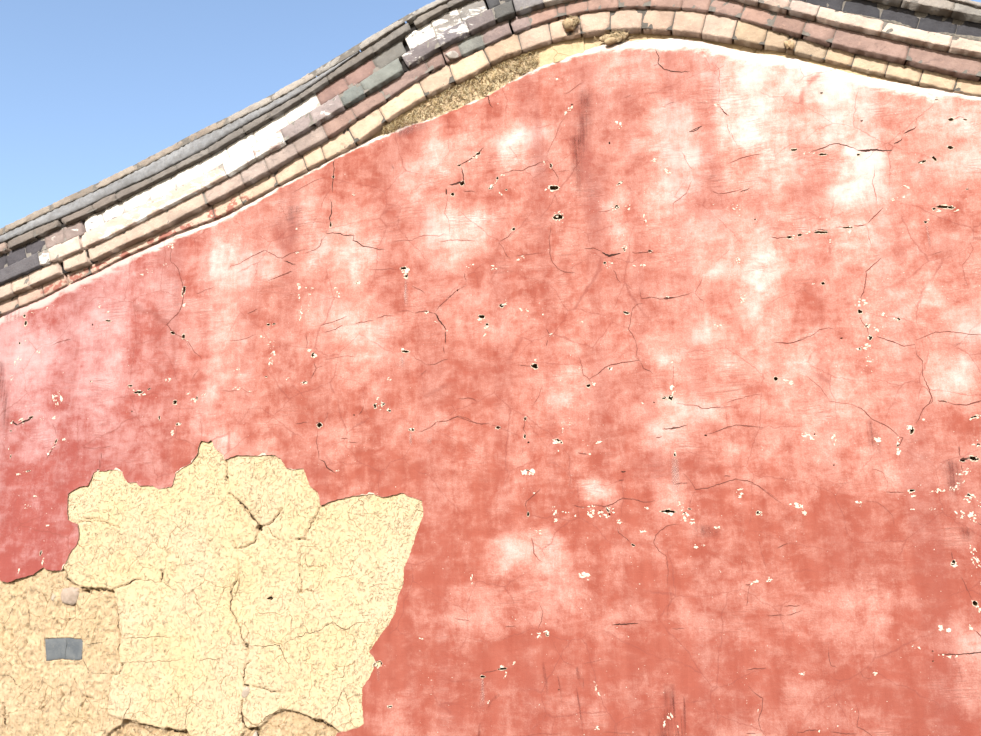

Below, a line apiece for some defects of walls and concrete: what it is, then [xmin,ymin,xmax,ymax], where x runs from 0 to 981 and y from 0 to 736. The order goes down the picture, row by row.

crack [61,221,98,273]
crack [235,149,482,280]
crack [297,274,465,473]
crack [408,330,553,443]
crack [499,119,572,273]
crack [579,246,758,438]
crack [801,115,981,523]
crack [224,467,324,585]
crack [552,439,652,507]
crack [65,570,218,732]
crack [230,578,371,736]
crack [942,552,981,658]